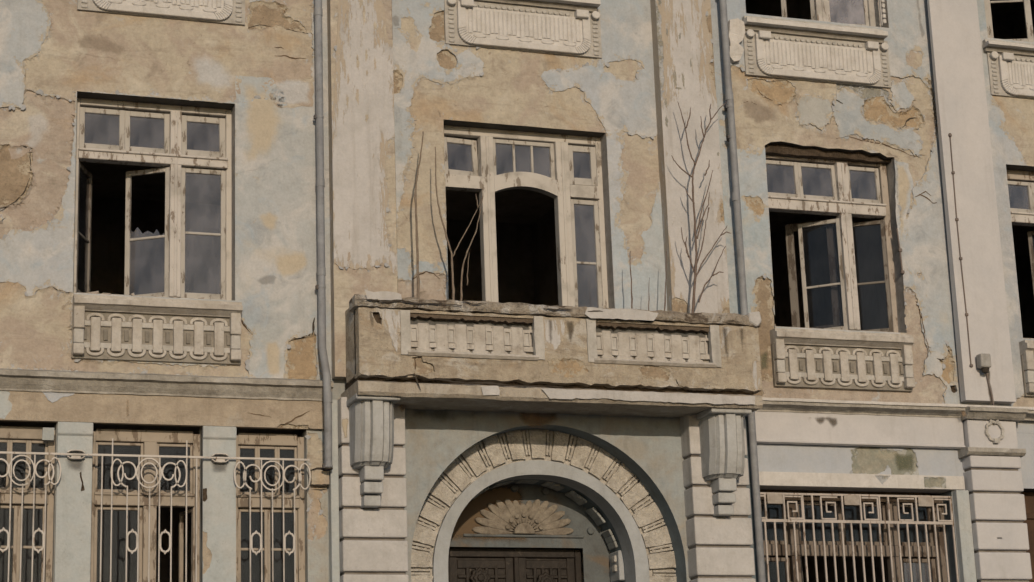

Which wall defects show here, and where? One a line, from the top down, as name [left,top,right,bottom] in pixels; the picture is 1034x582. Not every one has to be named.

peeling [0,0,314,239]
peeling [330,0,644,377]
peeling [618,131,660,263]
peeling [655,0,692,127]
peeling [704,0,716,90]
peeling [717,50,951,219]
peeling [0,282,252,378]
peeling [286,330,319,380]
peeling [850,446,946,488]